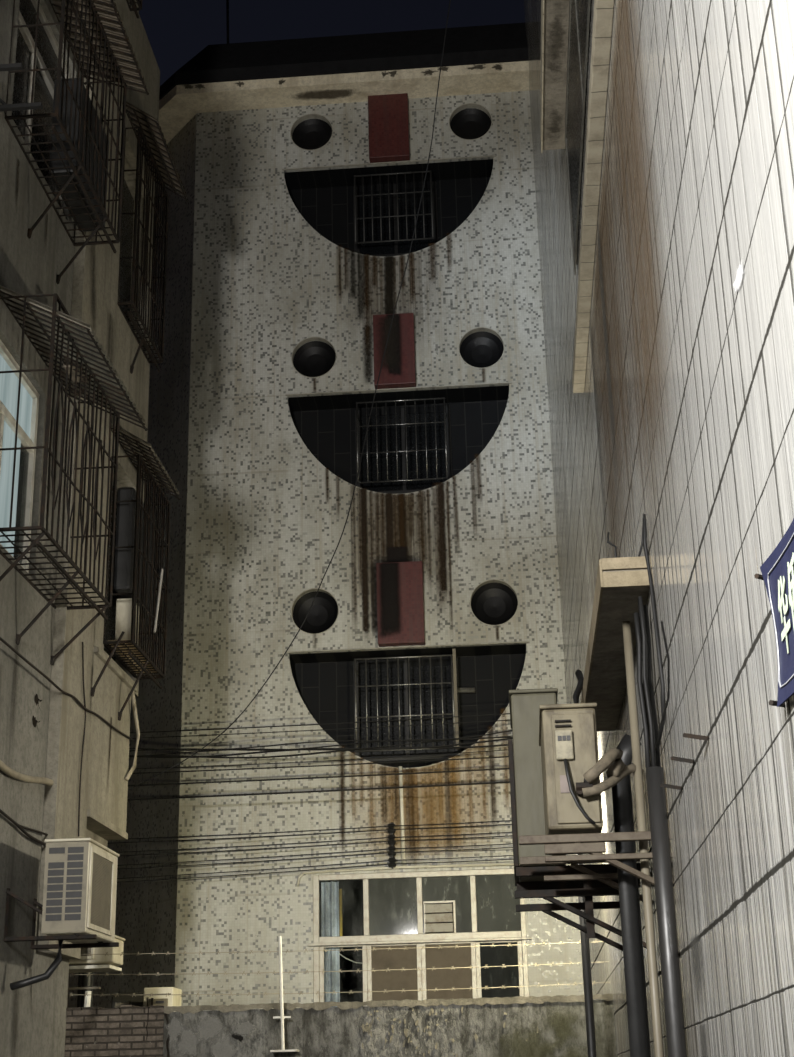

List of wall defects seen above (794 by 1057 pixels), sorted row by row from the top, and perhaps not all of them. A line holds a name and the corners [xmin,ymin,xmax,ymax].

rust [339,233,451,337]
rust [471,454,481,520]
rust [352,476,458,631]
rust [340,746,462,847]
rust [482,726,508,817]
peeling [361,1008,447,1057]